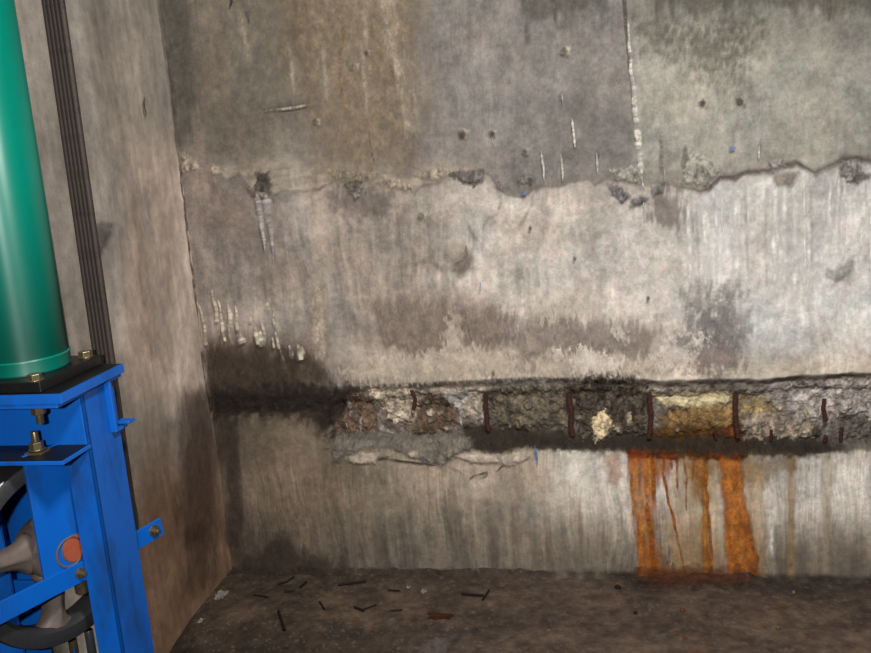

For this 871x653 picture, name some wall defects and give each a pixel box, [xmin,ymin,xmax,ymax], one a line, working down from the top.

damp [182,283,328,589]
spalling [346,452,379,464]
spalling [456,450,530,467]
damp [376,296,662,373]
spalling [331,312,871,444]
corrosion [628,398,778,585]
damp [655,186,752,379]
damp [771,173,811,295]
damp [826,175,871,278]